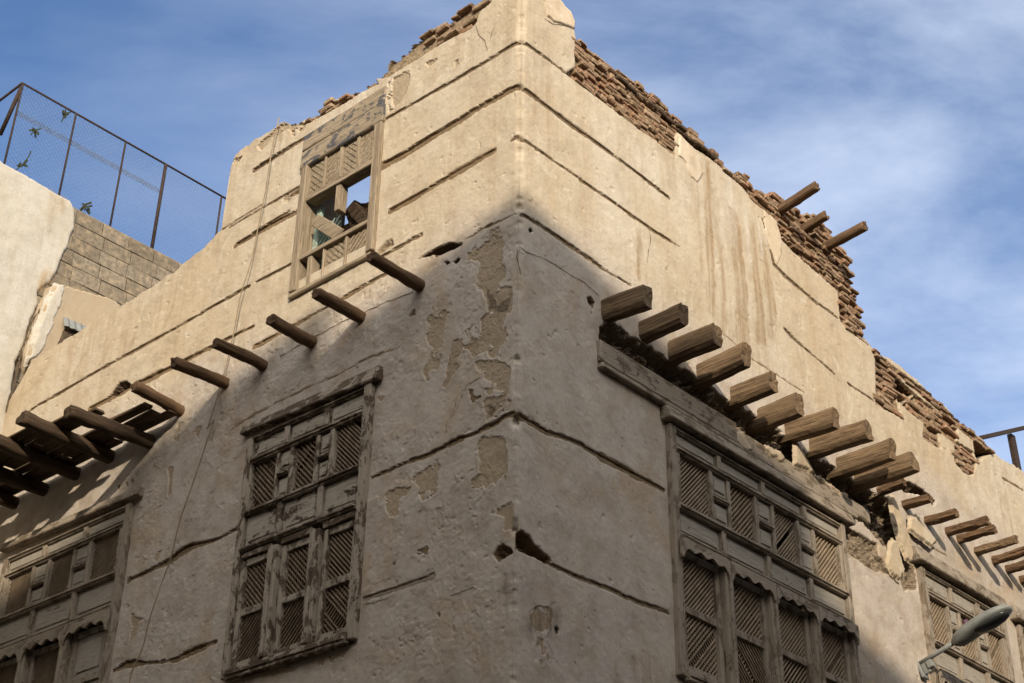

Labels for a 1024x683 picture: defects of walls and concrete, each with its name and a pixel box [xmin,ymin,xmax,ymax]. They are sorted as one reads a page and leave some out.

flaking render [423,227,513,422]
flaking render [386,460,441,517]
flaking render [471,436,508,489]
spalling [598,323,937,591]
spalling [494,544,513,562]
flaking render [530,607,553,665]